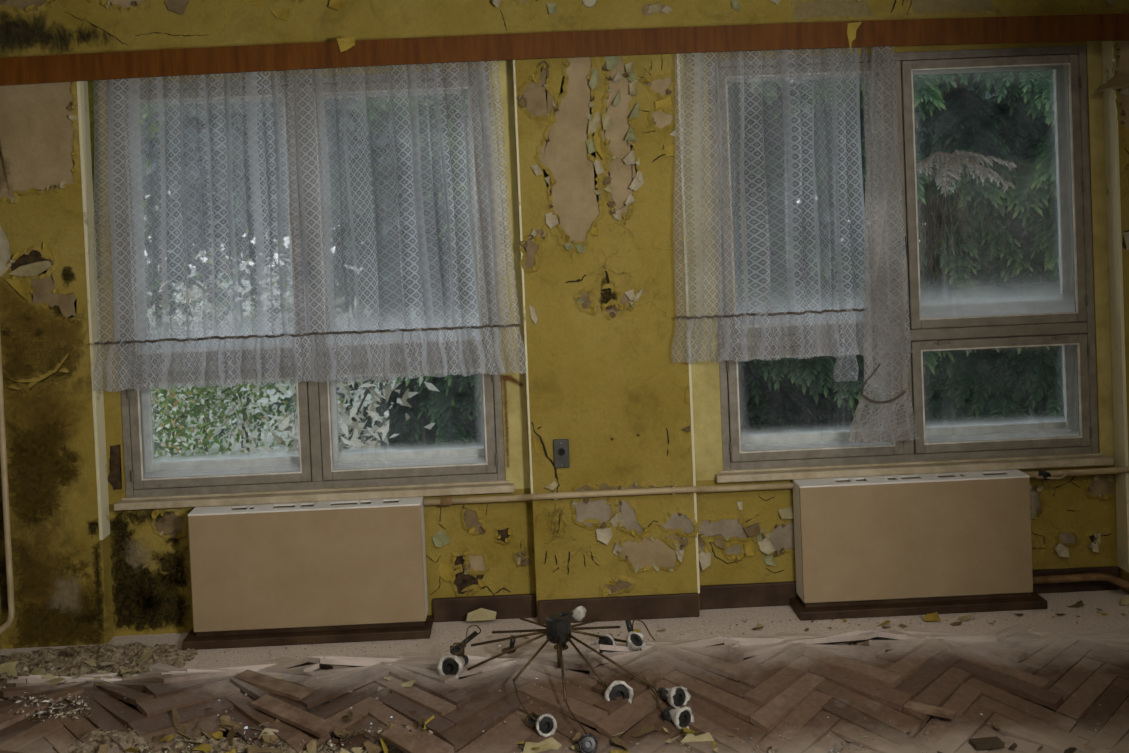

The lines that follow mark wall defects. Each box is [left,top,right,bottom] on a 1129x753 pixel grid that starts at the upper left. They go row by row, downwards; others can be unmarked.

mould [0,13,107,55]
peeling [1093,41,1129,134]
peeling [0,81,80,204]
peeling [516,55,678,273]
peeling [0,225,77,318]
damp [61,267,75,286]
peeling [572,285,643,321]
damp [0,290,191,648]
crack [426,508,514,595]
peeling [432,504,531,597]
crack [513,421,603,575]
peeling [545,478,795,597]